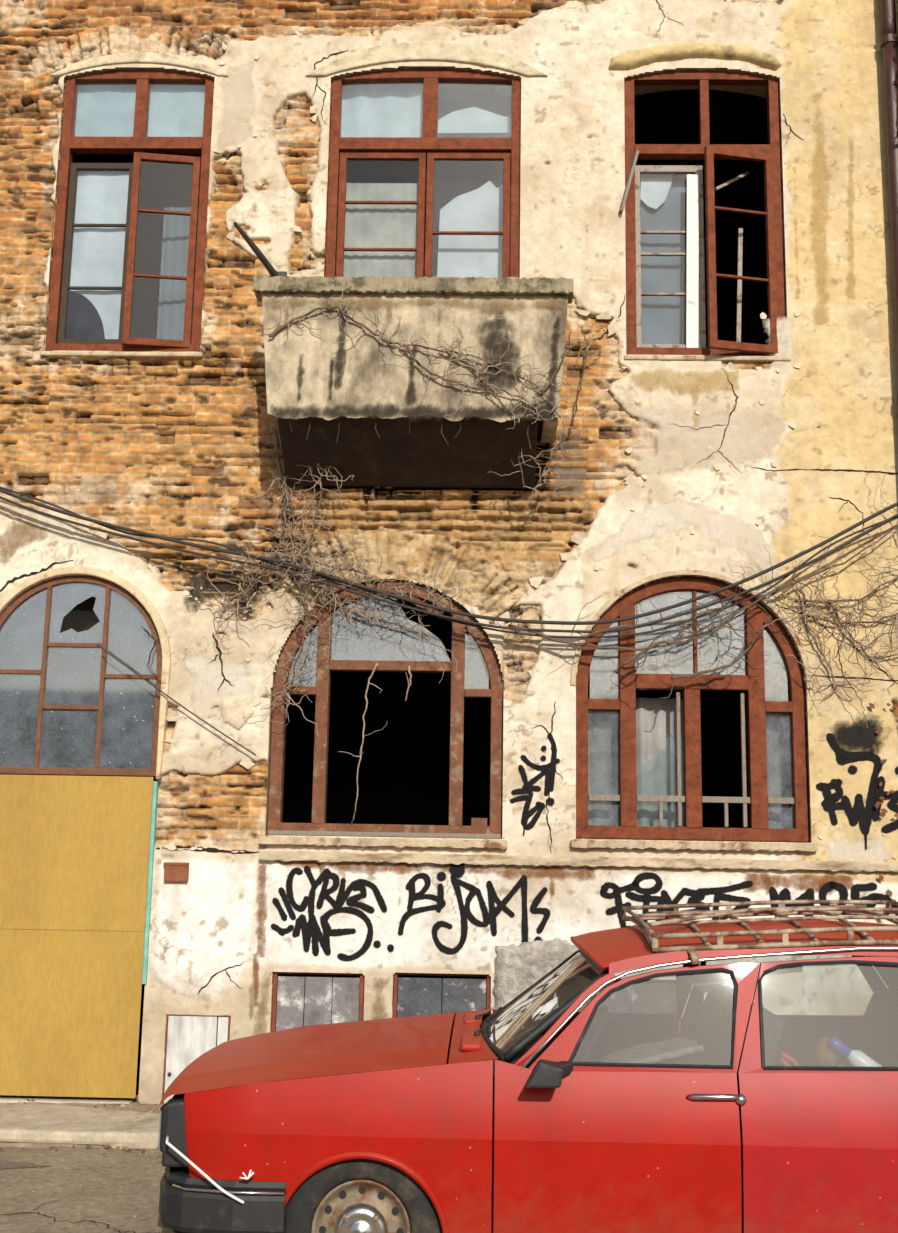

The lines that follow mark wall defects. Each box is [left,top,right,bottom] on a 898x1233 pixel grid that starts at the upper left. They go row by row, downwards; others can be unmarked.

flaking render [0,0,802,703]
damp [273,298,560,419]
damp [305,433,583,514]
crack [676,370,898,529]
crack [0,560,74,592]
peeling [164,646,260,753]
flaking render [155,758,269,850]
crack [198,961,247,994]
crack [1,1198,160,1233]